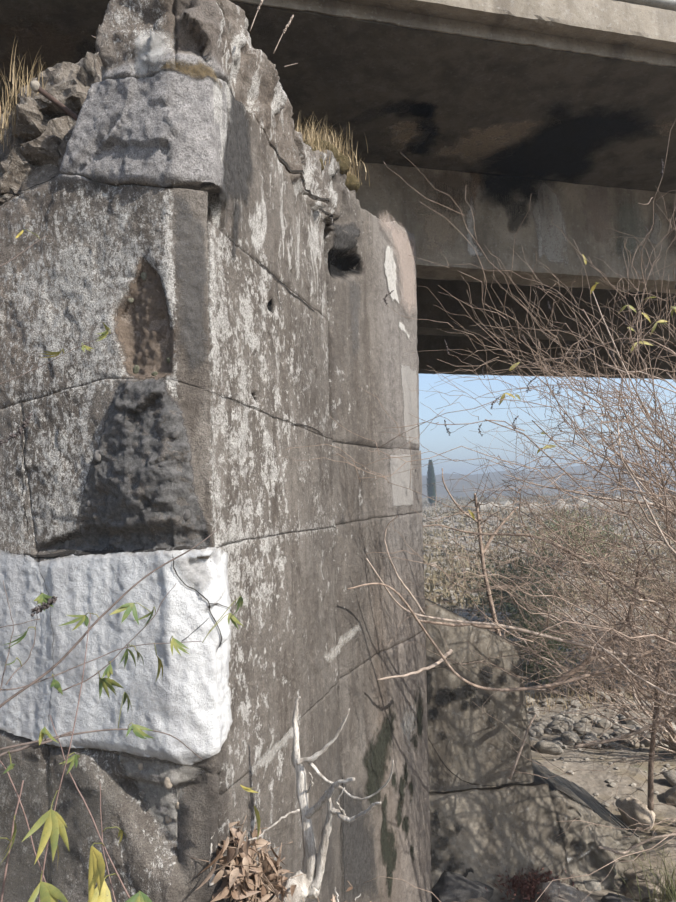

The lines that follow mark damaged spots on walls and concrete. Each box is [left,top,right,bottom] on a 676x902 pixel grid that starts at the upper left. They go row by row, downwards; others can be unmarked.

water stain [352,101,441,155]
water stain [416,104,653,262]
crack [257,259,314,311]
crack [218,394,392,449]
peeling [0,257,233,844]
water stain [403,658,525,740]
crack [428,738,527,787]
water stain [341,778,396,901]